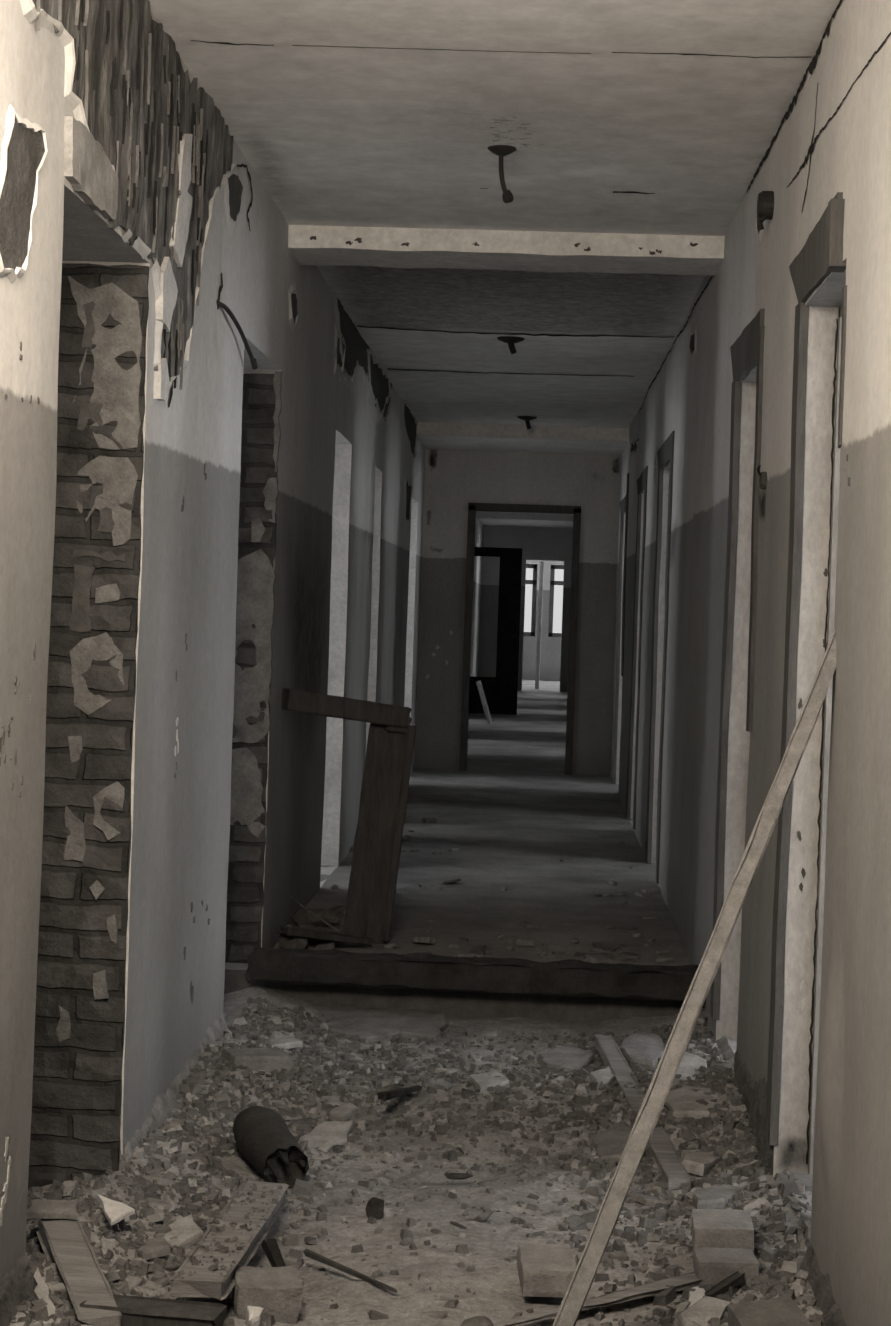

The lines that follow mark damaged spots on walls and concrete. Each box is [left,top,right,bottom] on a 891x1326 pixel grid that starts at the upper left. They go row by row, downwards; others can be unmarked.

flaking render [0,105,47,284]
crack [190,0,891,211]
flaking render [14,0,244,1190]
flaking render [225,371,282,963]